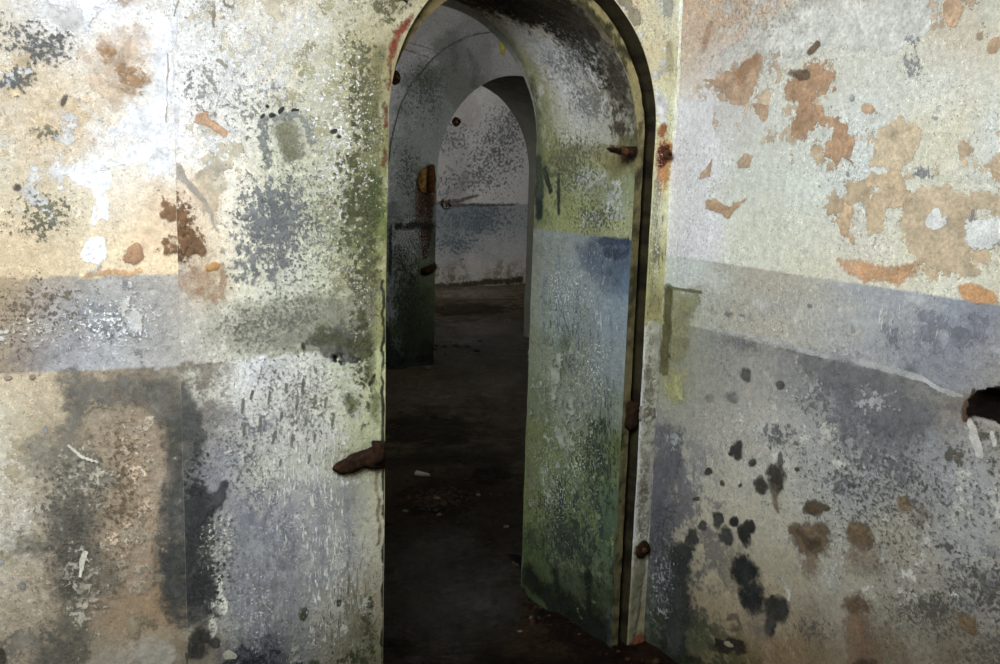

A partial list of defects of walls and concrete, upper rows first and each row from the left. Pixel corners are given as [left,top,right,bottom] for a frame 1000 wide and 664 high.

damp [0,11,78,98]
peeling [615,0,673,38]
rust [657,123,673,190]
peeling [684,0,1000,282]
rust [416,185,436,259]
damp [0,43,560,664]
peeling [701,266,1000,490]
damp [470,554,632,664]